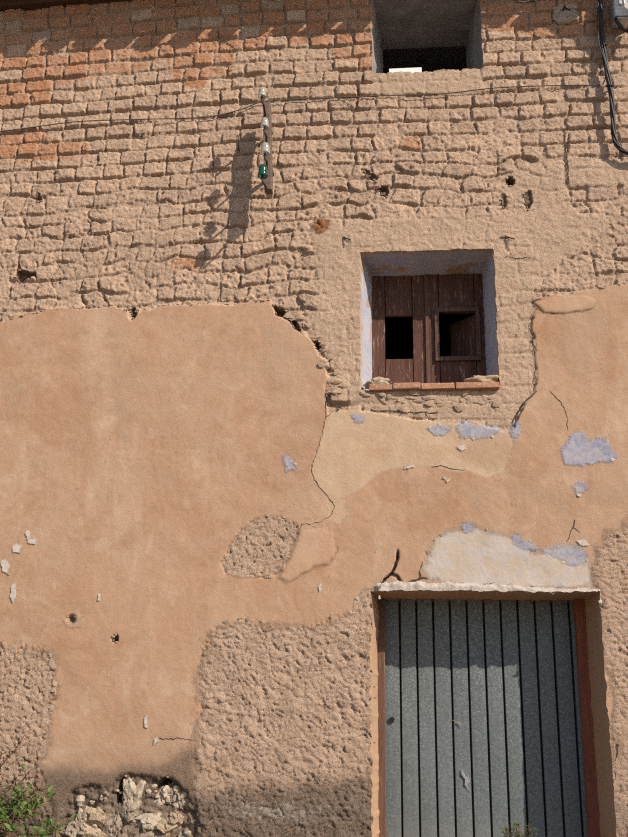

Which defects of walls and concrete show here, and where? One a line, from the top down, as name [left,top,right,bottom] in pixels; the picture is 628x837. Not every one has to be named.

spalling [362,167,388,198]
flaking render [69,303,138,319]
flaking render [283,310,343,395]
crack [515,314,568,427]
crack [298,393,346,531]
crack [370,409,439,418]
flaking render [359,389,501,450]
peeling [561,430,617,466]
crack [381,552,439,583]
spalling [0,514,628,837]